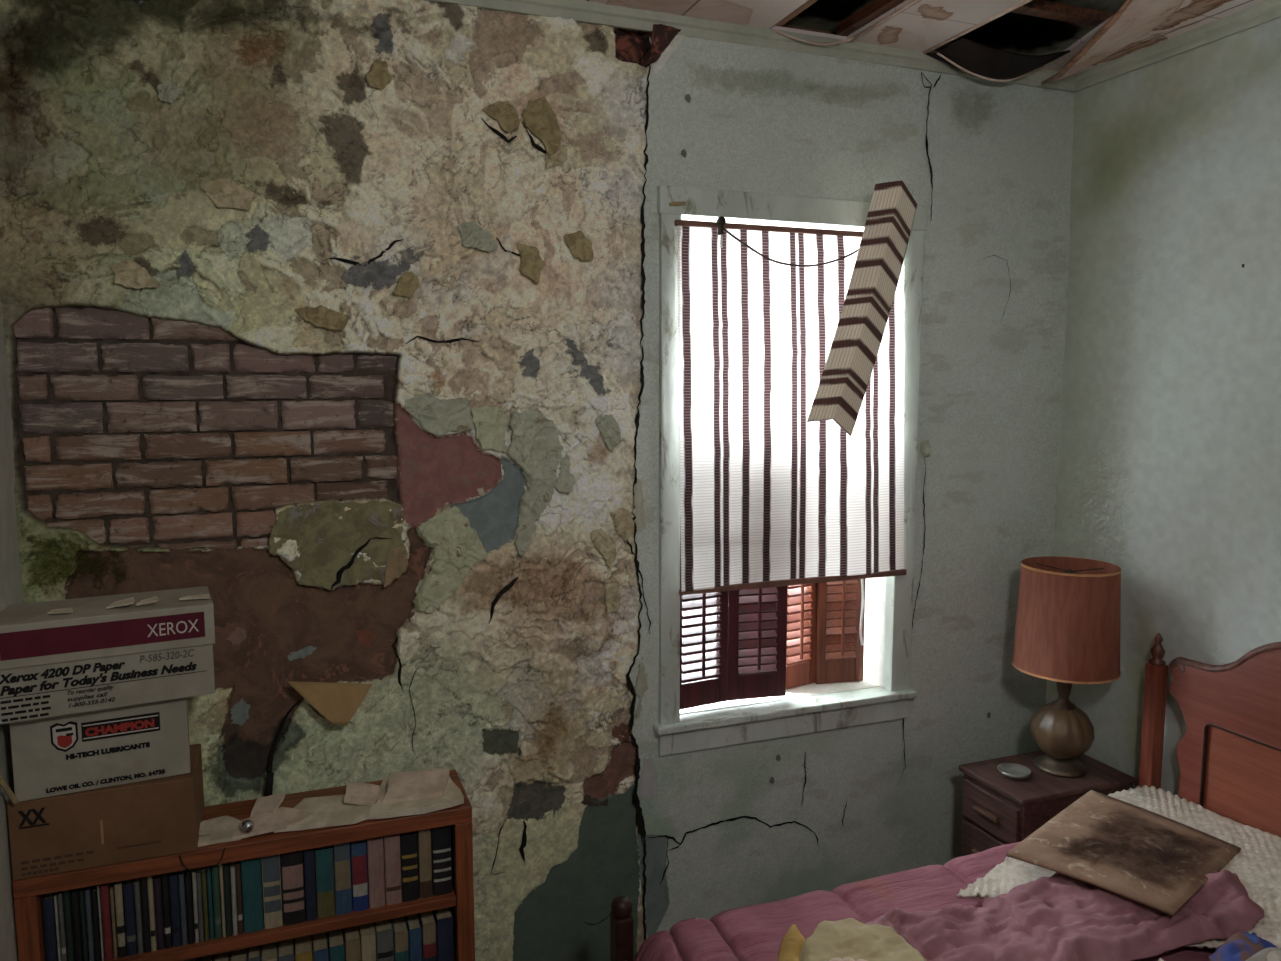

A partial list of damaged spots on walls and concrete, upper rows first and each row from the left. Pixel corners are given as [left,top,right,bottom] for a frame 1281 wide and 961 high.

peeling [438,2,465,30]
spalling [584,24,684,75]
peeling [319,13,393,186]
peeling [483,96,567,169]
crack [921,72,941,219]
peeling [341,246,424,299]
peeling [564,230,594,261]
peeling [565,339,611,396]
crack [626,33,847,941]
flaking render [13,305,576,778]
crack [912,458,926,628]
crack [897,718,906,790]